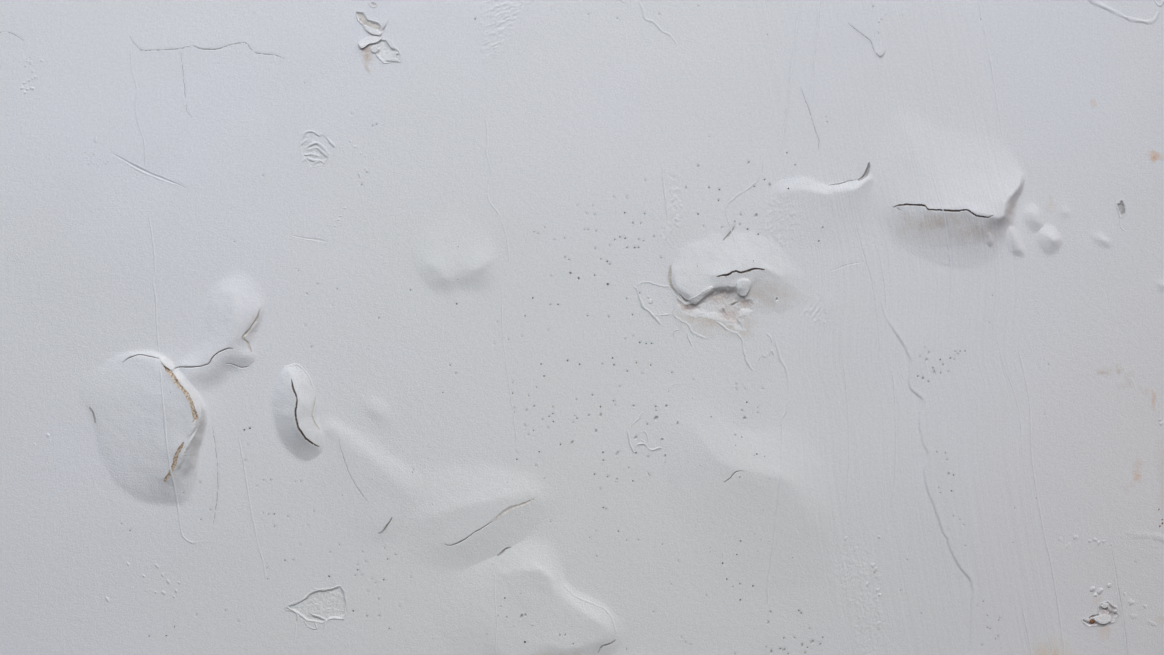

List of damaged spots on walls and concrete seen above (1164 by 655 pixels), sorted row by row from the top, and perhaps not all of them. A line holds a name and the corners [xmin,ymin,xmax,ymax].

peeling [355,1,402,76]
crack [129,36,285,167]
peeling [284,585,348,640]